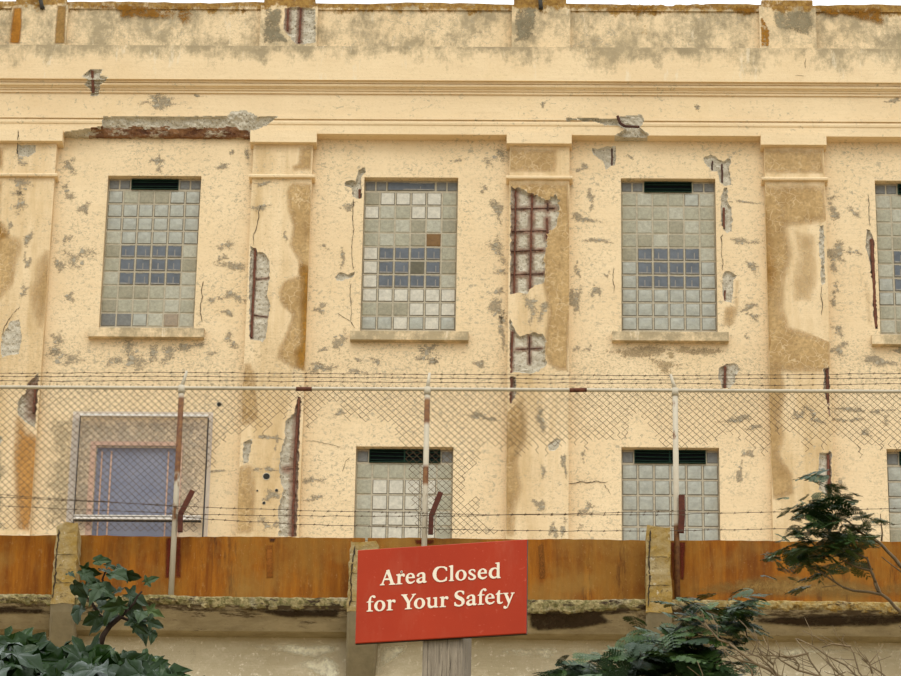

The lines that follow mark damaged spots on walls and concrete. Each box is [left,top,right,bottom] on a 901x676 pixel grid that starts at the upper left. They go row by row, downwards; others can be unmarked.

water stain [55,6,66,43]
spalling [64,94,278,139]
spalling [703,154,763,245]
water stain [0,227,20,296]
spalling [208,240,271,342]
water stain [280,183,311,368]
spalling [480,185,560,404]
spalling [722,271,737,303]
water stain [765,186,830,497]
spalling [819,196,878,329]
spalling [17,374,39,428]
spalling [210,397,326,537]